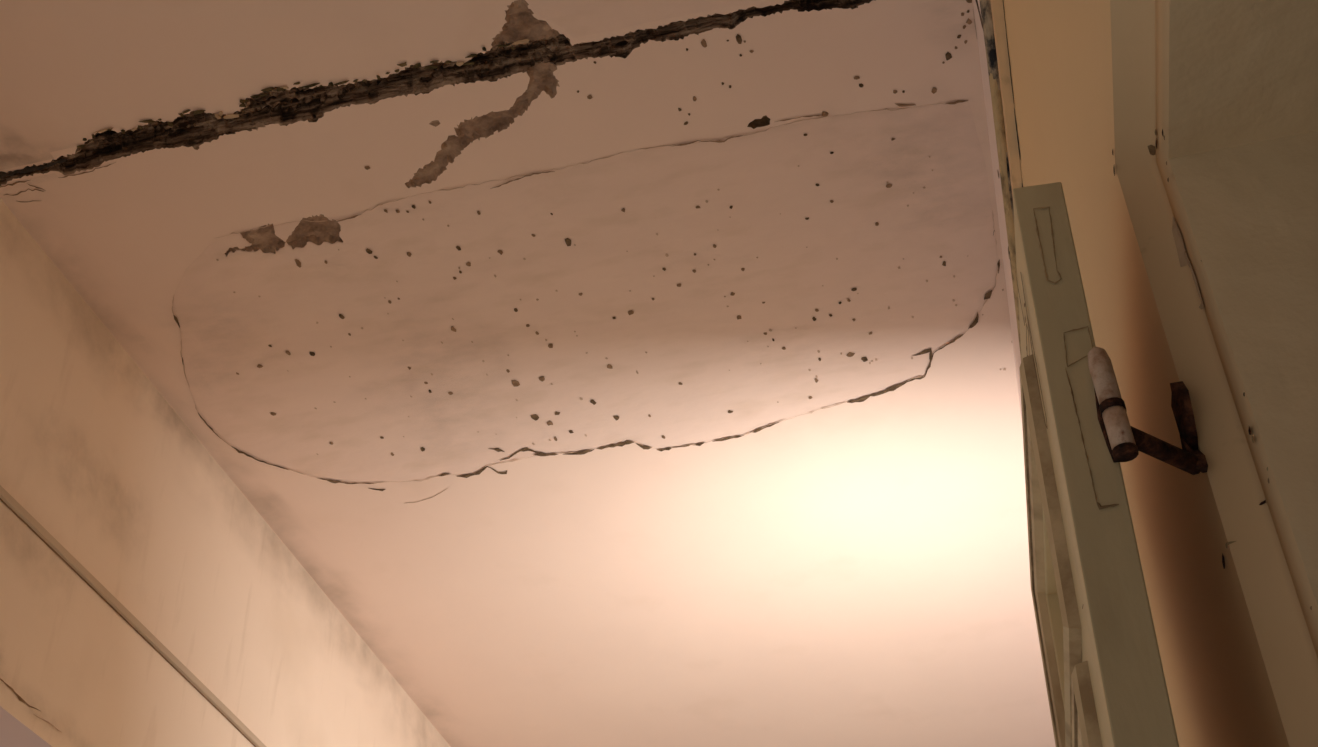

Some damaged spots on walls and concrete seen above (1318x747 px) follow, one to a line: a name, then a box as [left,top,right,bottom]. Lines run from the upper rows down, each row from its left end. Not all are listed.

spalling [490,0,570,50]
spalling [942,0,972,64]
crack [973,0,983,37]
crack [0,0,872,202]
spalling [384,62,560,221]
crack [218,100,968,238]
spalling [216,214,343,268]
crack [172,211,1000,503]
spalling [516,412,587,445]